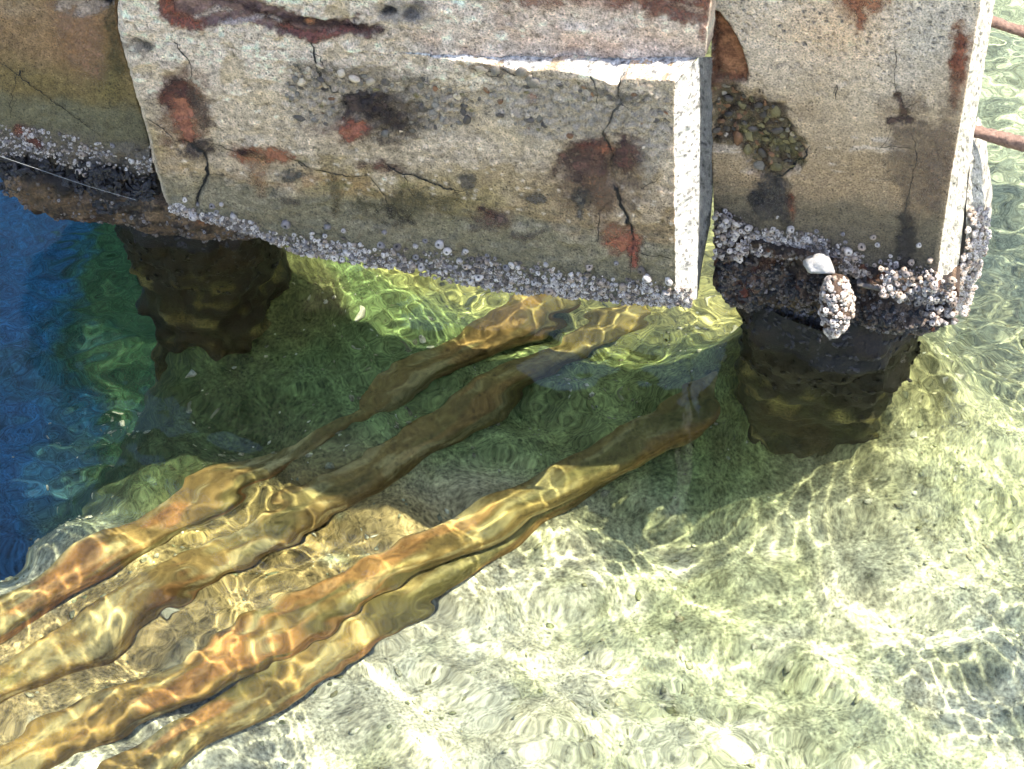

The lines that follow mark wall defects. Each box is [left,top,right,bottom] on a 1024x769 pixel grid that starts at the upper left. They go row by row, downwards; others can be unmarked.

rust [157,0,385,44]
rust [605,0,749,95]
rust [948,20,970,109]
rust [158,70,215,159]
crack [147,119,235,202]
rust [315,90,421,146]
crack [288,157,506,222]
rust [552,133,645,268]
crack [590,74,674,273]
spalling [712,83,807,173]